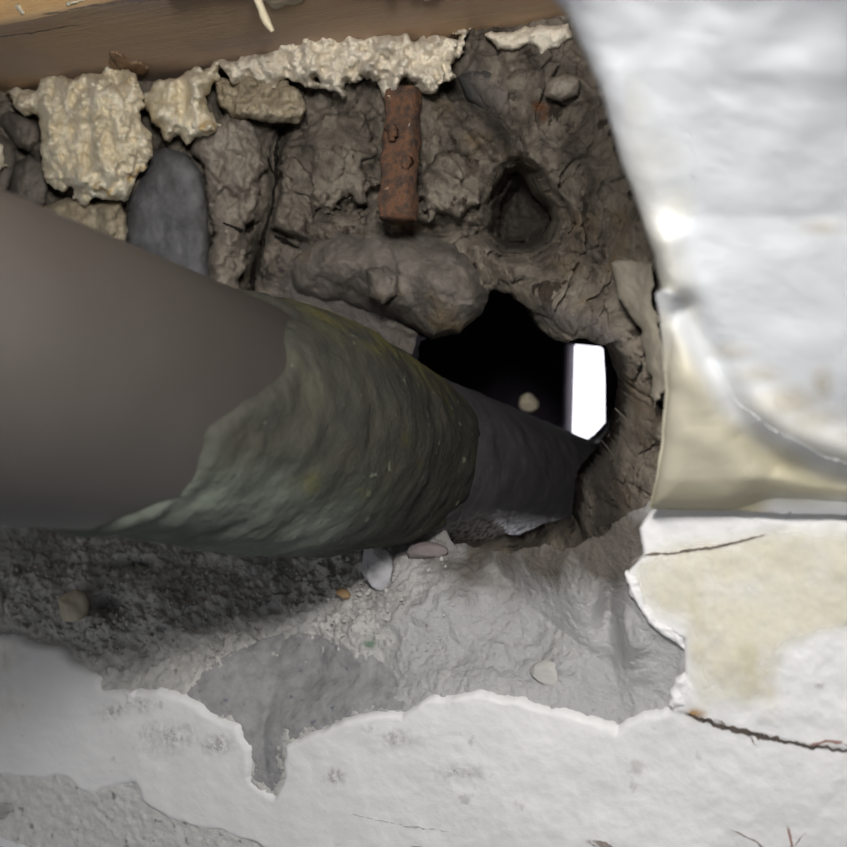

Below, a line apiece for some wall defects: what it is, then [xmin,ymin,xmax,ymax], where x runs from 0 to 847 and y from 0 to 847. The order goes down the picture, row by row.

rust [378,85,422,226]
spalling [485,159,571,258]
spalling [519,393,539,412]
crack [632,535,764,563]
spalling [0,500,692,796]
leakage [649,537,847,692]
crack [688,711,847,753]